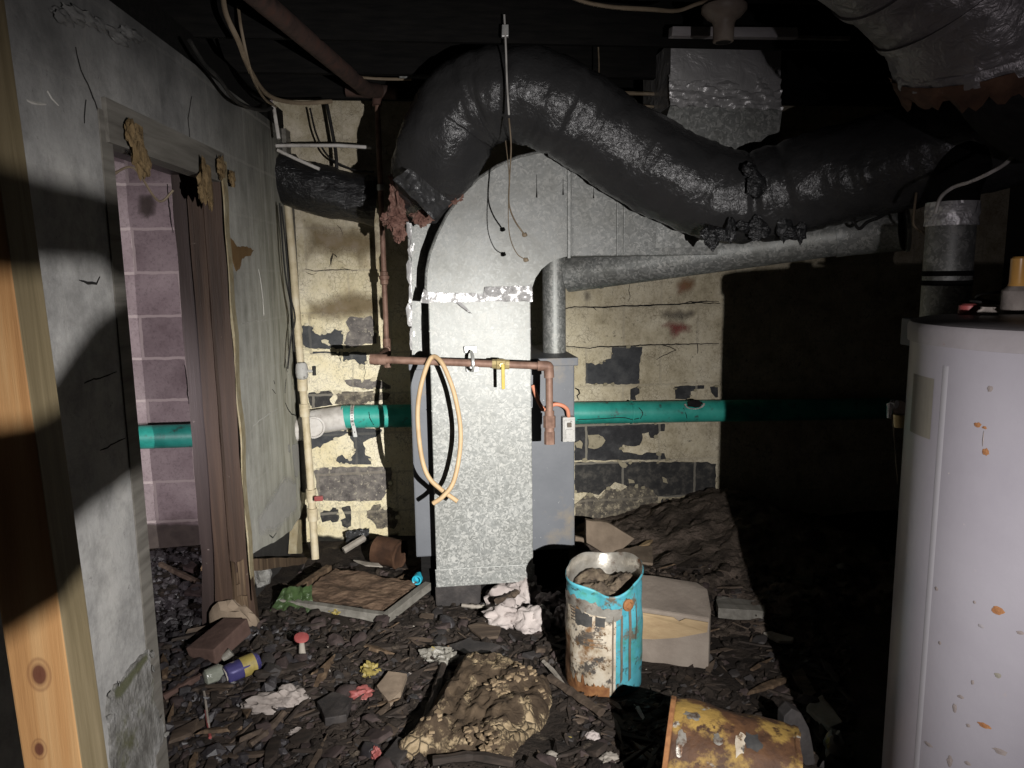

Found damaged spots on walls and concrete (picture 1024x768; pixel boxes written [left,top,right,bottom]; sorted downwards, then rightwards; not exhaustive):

crack [75,47,98,124]
damp [312,230,375,254]
damp [313,295,378,316]
crack [566,284,720,310]
peeling [302,316,391,410]
peeling [585,345,642,401]
peeling [673,385,720,410]
peeling [311,428,401,530]
peeling [574,423,717,525]